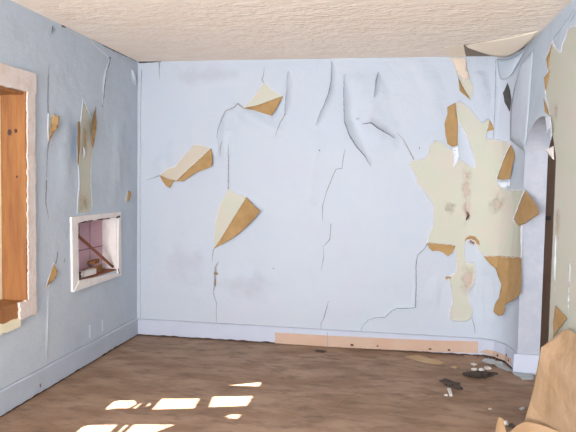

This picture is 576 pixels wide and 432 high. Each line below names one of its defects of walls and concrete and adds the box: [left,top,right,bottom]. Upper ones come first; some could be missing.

peeling [47,73,59,159]
peeling [77,99,97,214]
crack [91,42,161,79]
peeling [148,144,212,188]
peeling [212,149,260,262]
peeling [217,72,284,134]
crack [321,151,345,270]
peeling [409,76,539,322]
peeling [464,31,538,57]
peeling [544,9,576,342]
peeling [46,252,65,289]
crack [212,262,220,320]